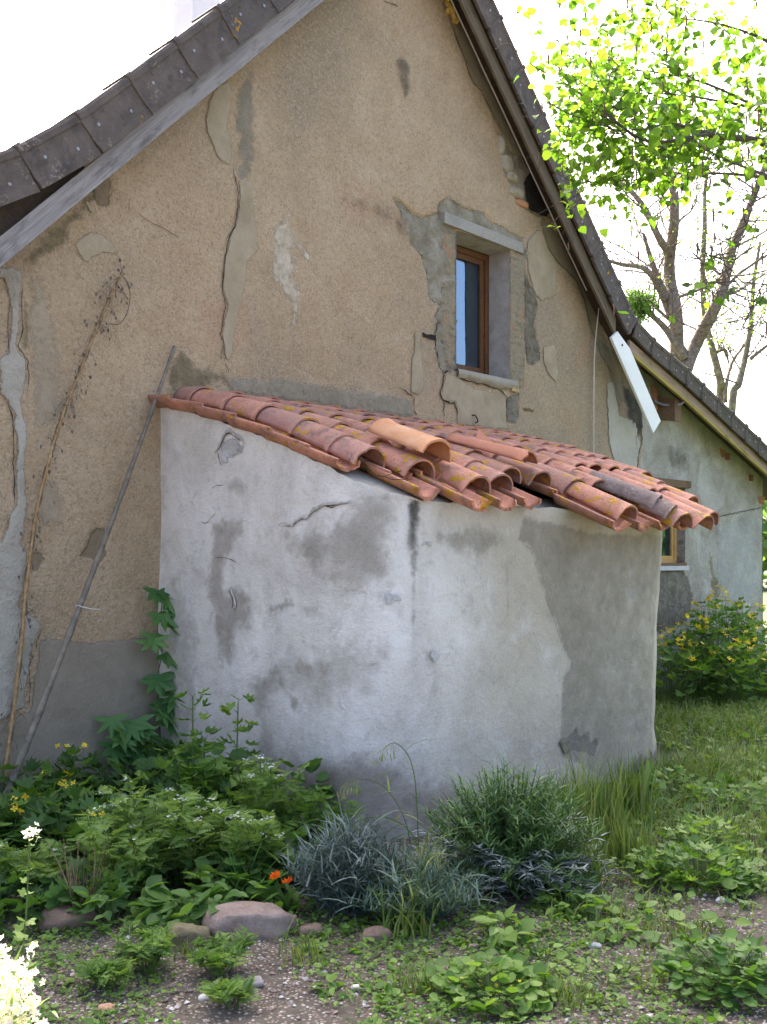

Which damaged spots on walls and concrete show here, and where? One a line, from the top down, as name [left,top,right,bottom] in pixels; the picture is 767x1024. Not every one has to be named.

spalling [395,198,540,423]